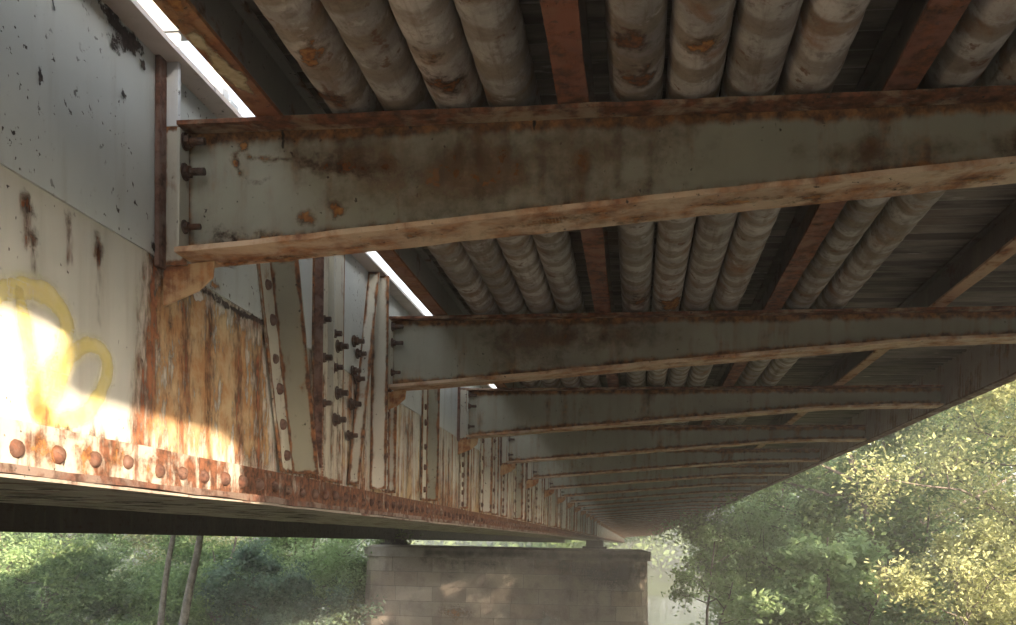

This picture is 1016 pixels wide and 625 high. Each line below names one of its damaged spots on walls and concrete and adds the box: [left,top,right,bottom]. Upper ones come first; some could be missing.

corrosion [295,39,327,67]
corrosion [423,76,465,95]
corrosion [20,193,38,268]
corrosion [94,233,103,267]
corrosion [112,253,269,470]
corrosion [31,410,70,465]
corrosion [75,432,105,475]